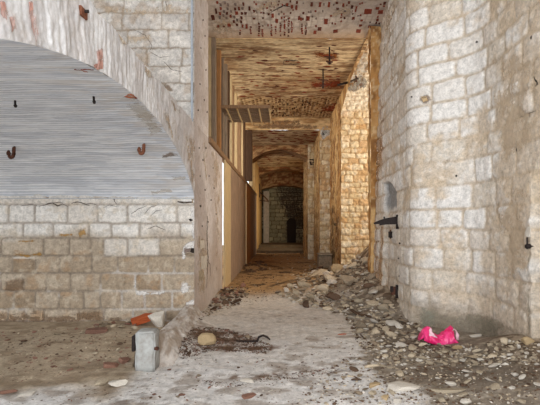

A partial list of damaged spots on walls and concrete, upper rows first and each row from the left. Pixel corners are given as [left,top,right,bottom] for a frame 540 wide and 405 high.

crack [23,199,117,207]